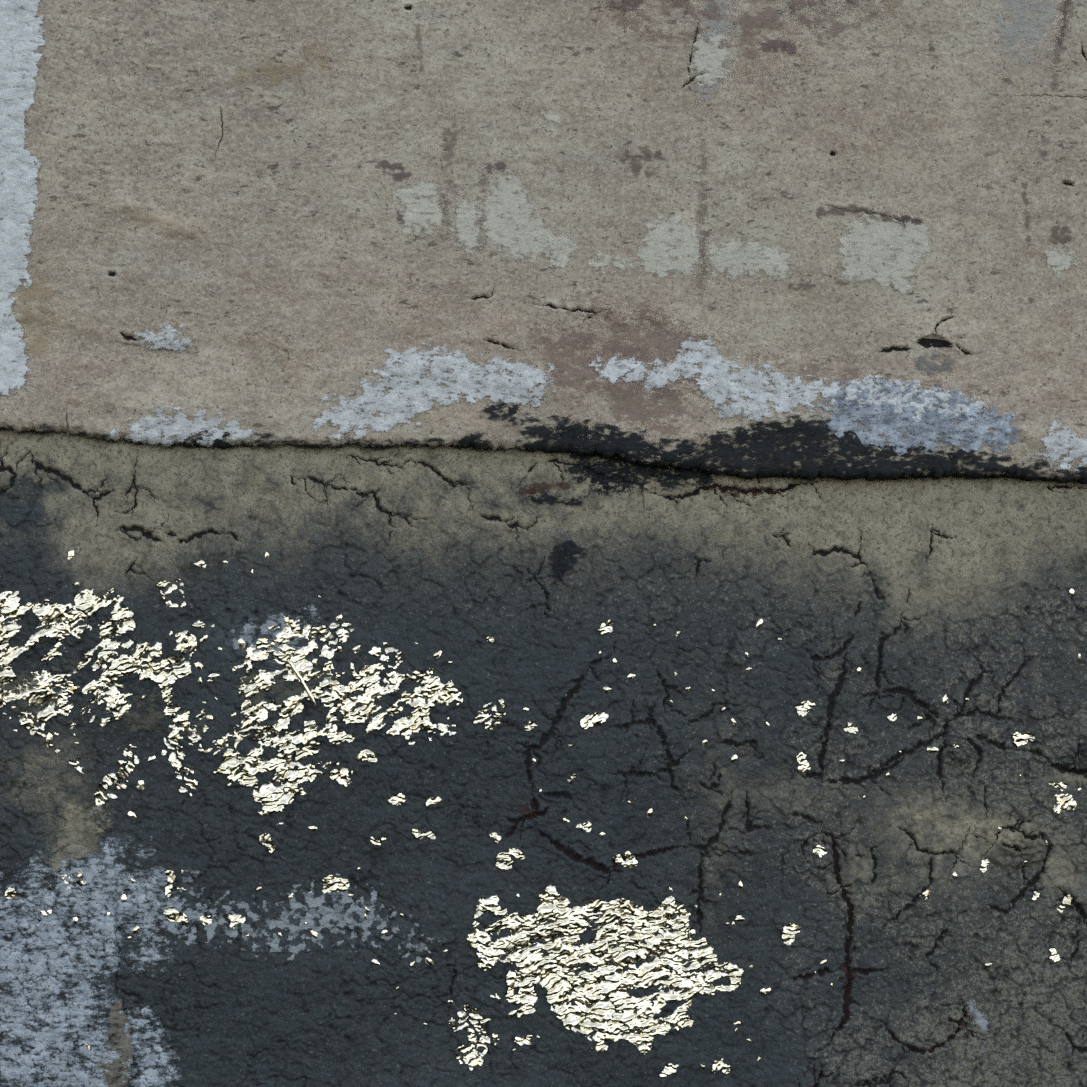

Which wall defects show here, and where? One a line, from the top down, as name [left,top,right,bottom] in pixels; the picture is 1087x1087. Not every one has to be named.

leakage [529,292,715,434]
crack [878,346,911,354]
crack [934,316,973,355]
crack [0,445,239,582]
crack [291,453,541,542]
crack [515,455,823,513]
crack [1045,482,1087,492]
crack [506,528,1087,1087]
crack [111,880,143,1004]
crack [441,964,457,1004]